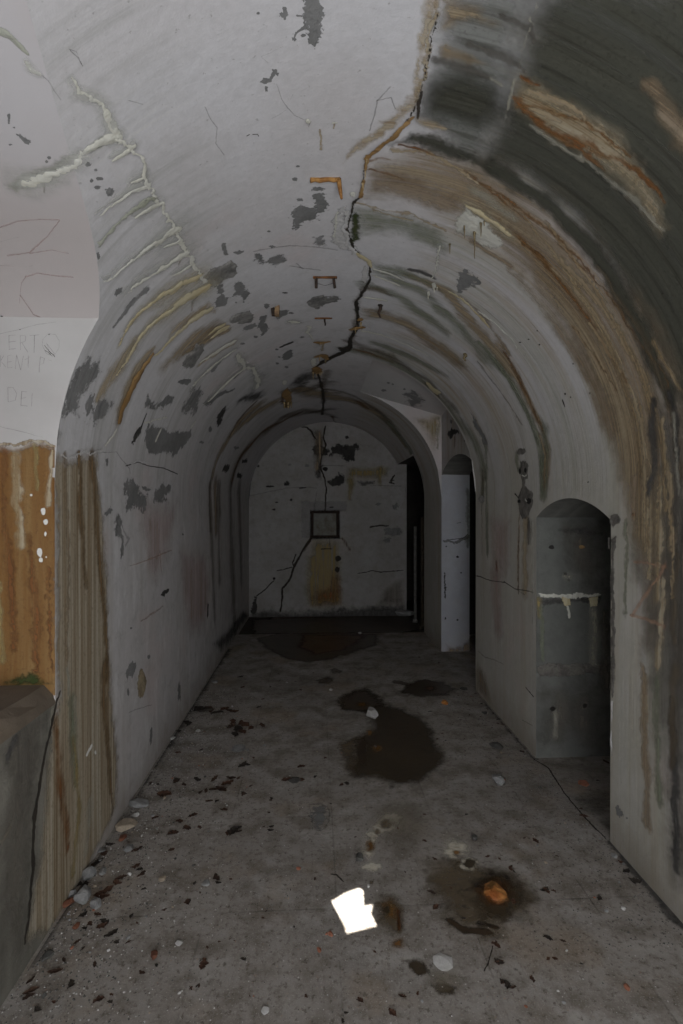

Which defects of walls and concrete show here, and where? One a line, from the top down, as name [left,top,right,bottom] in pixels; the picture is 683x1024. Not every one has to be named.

rust [0,439,55,695]
water stain [13,77,213,421]
peeling [105,479,171,558]
peeling [144,343,229,457]
crack [251,537,312,614]
peeling [279,0,324,49]
peeling [288,187,330,230]
crack [302,11,438,511]
rust [350,116,653,552]
water stain [455,172,683,874]
rust [513,75,665,212]
crack [24,690,61,945]